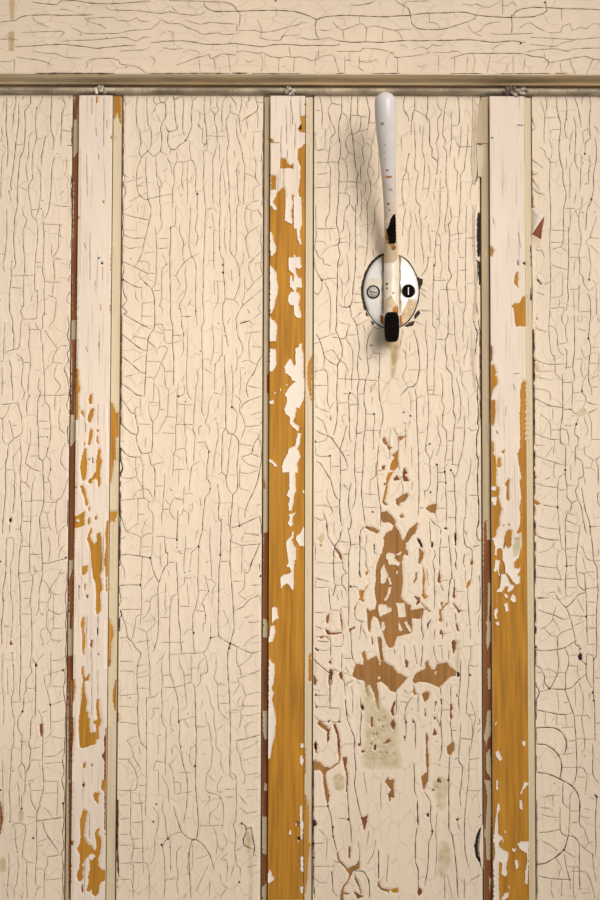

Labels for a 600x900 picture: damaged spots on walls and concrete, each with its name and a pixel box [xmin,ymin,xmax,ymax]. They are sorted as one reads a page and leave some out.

peeling [72,152,80,320]
peeling [114,96,122,123]
crack [0,0,600,74]
peeling [62,340,119,898]
crack [0,96,506,900]
peeling [260,144,355,900]
peeling [337,847,363,900]
peeling [385,777,394,802]
peeling [328,436,460,791]
peeling [470,380,541,900]
crack [513,97,600,899]